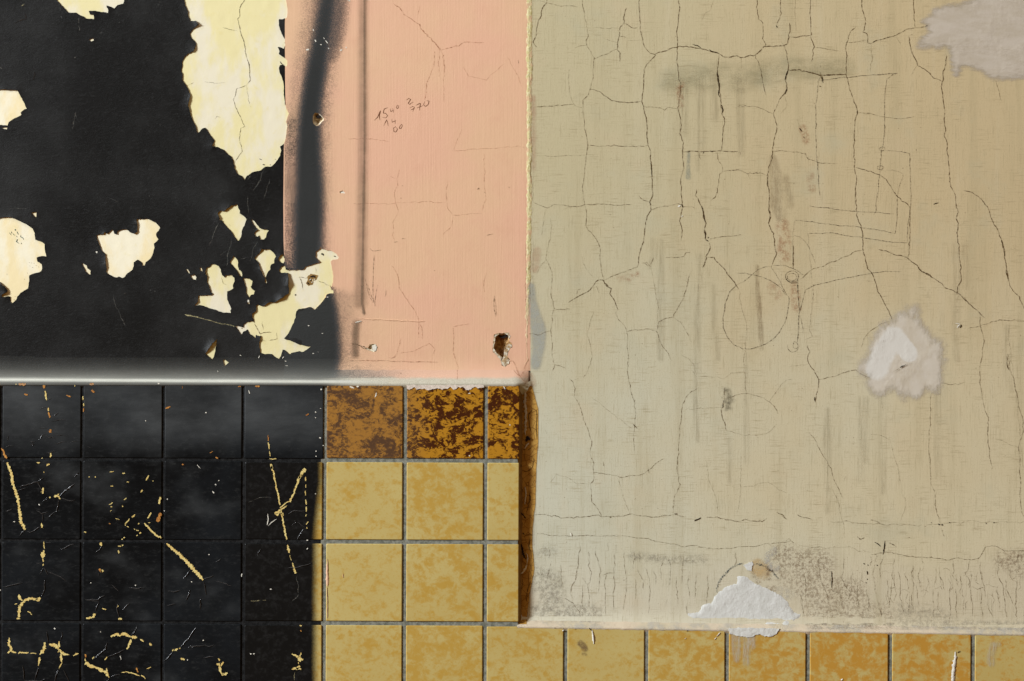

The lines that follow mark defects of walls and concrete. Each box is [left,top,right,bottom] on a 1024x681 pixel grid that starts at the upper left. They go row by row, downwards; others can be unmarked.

peeling [0,90,27,129]
peeling [181,0,289,180]
peeling [0,212,46,303]
peeling [96,219,160,278]
peeling [186,205,339,366]
hole [493,332,523,375]
crack [498,0,1024,619]
crack [37,385,60,499]
crack [7,594,152,678]
crack [292,625,303,678]